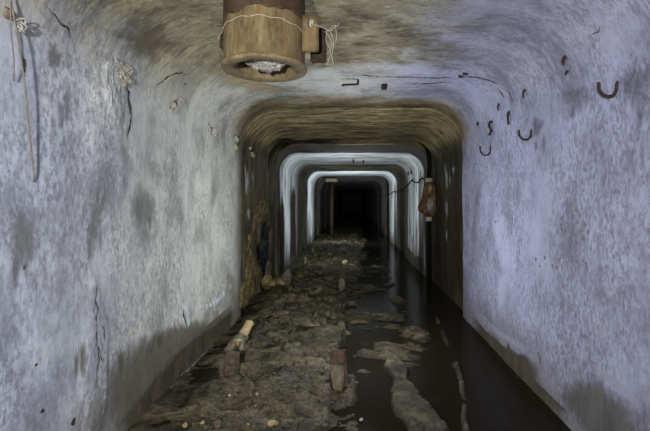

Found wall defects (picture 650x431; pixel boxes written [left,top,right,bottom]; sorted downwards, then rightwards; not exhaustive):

spalling [239,199,270,308]
damp [75,348,86,373]
crack [93,287,105,390]
damp [106,310,231,427]
damp [477,322,635,431]